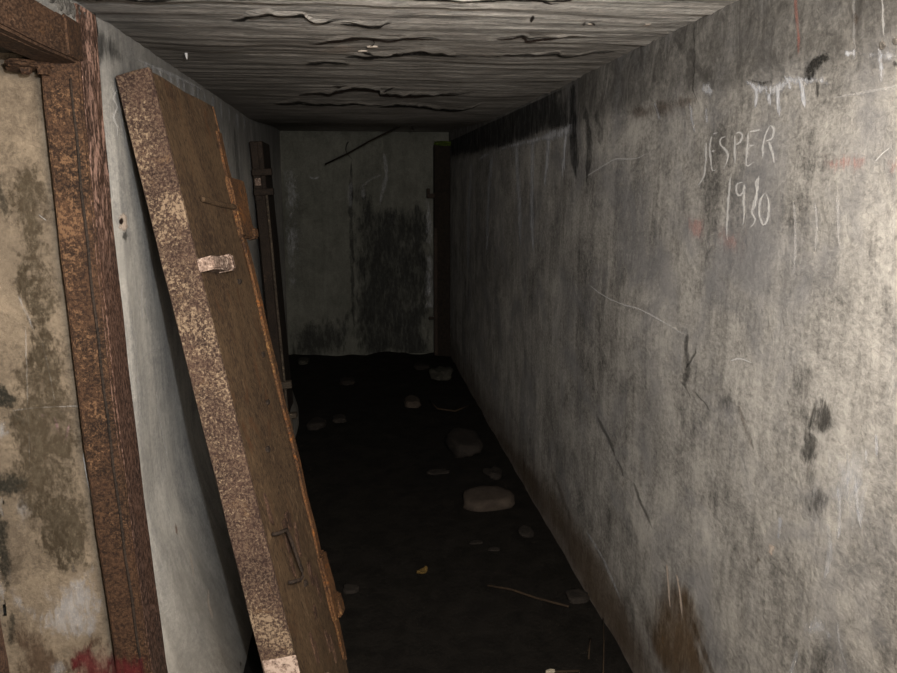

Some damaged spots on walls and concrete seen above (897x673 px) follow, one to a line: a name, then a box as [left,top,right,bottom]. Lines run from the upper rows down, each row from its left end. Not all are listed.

crack [128,0,170,8]
crack [231,0,628,112]
efflorescence [748,75,823,113]
leakage [357,195,428,353]
leakage [0,167,87,569]
leakage [0,515,11,586]
rust [17,631,64,673]
rust [653,565,703,673]